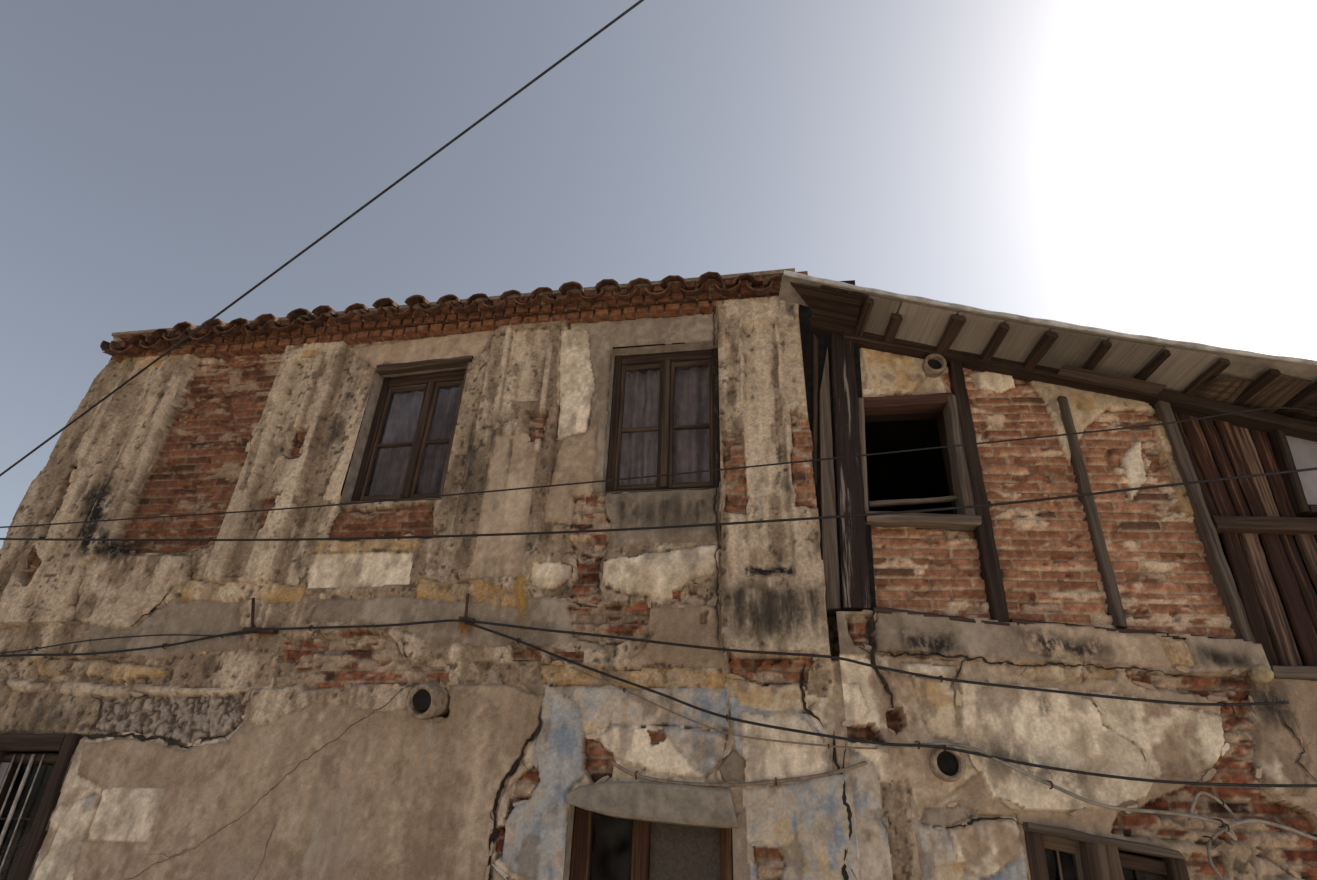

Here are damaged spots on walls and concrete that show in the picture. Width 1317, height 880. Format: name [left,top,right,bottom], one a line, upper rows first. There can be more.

peeling [527,325,596,442]
water stain [81,485,137,559]
peeling [74,348,1317,880]
water stain [734,590,814,634]
flaking render [37,657,252,746]
crack [1281,715,1317,781]
peeling [33,793,102,880]
crack [488,709,542,880]